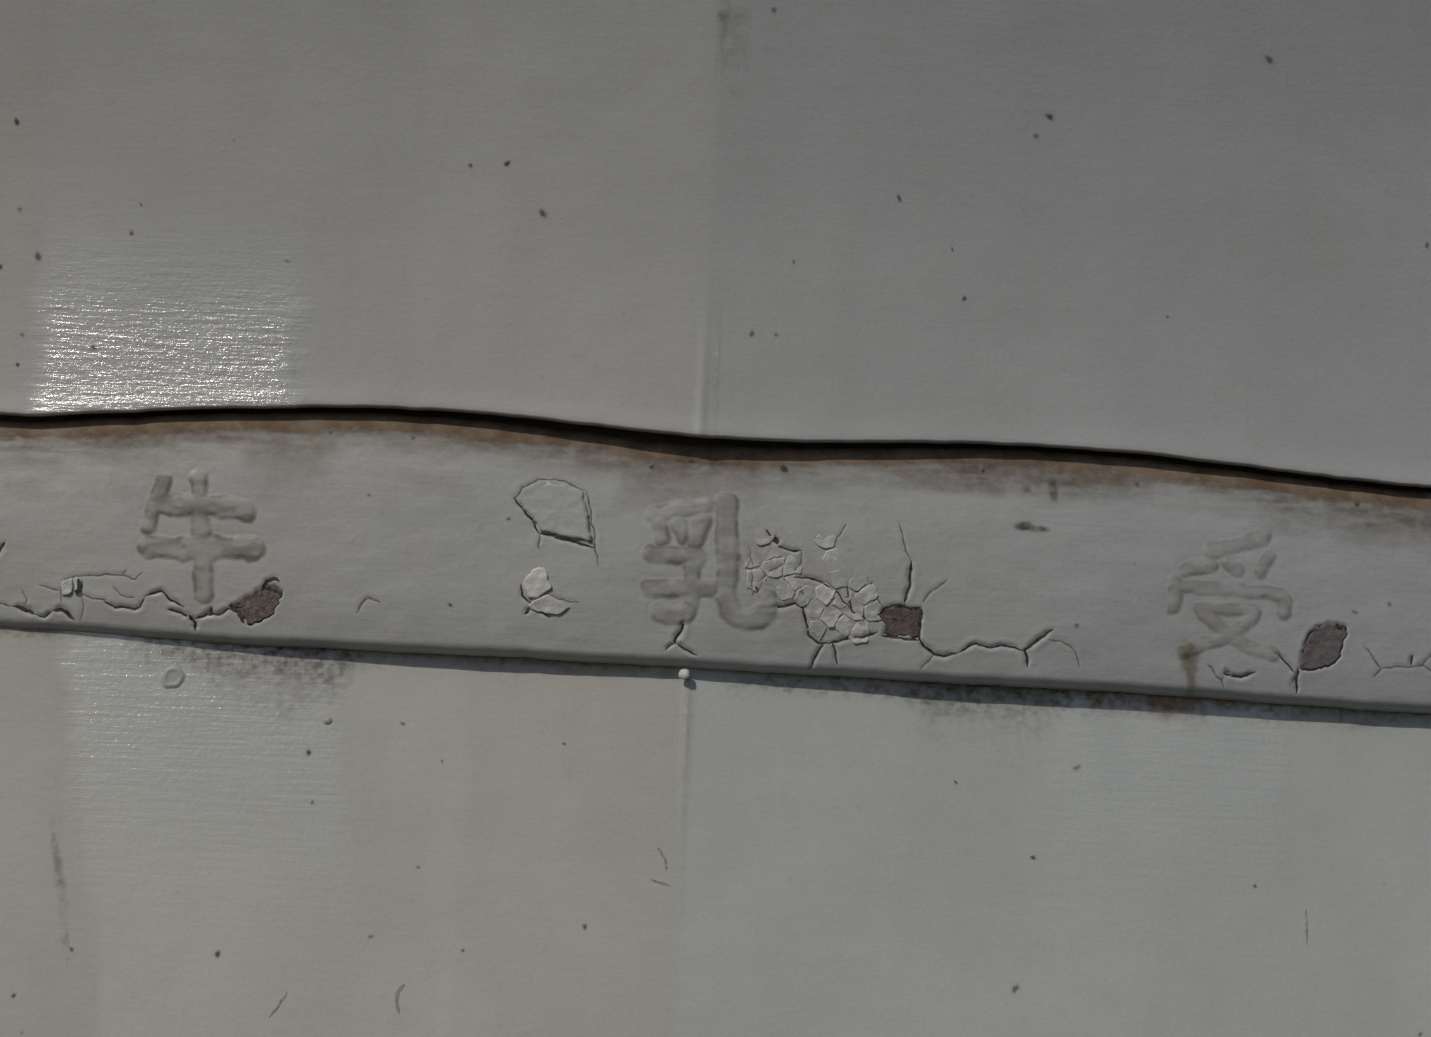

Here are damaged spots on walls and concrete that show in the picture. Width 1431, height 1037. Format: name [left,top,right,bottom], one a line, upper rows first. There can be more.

peeling [513,478,598,565]
crack [867,523,947,608]
crack [0,571,229,631]
peeling [229,577,282,625]
peeling [520,567,578,617]
peeling [742,524,923,670]
crack [919,629,1079,670]
peeling [1299,622,1348,671]
crack [1364,647,1431,676]